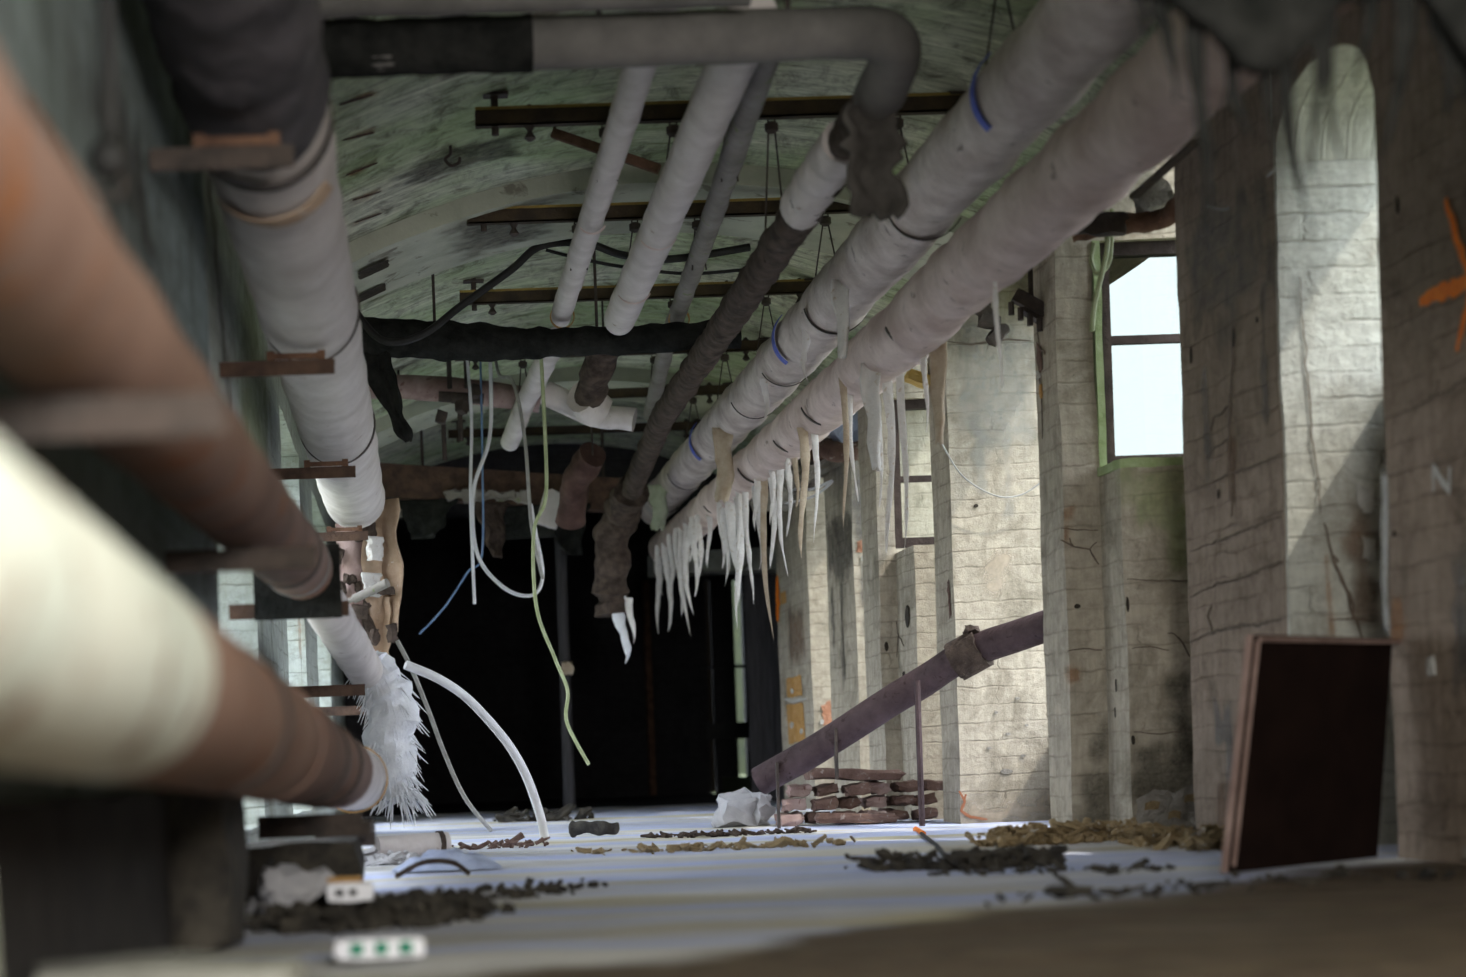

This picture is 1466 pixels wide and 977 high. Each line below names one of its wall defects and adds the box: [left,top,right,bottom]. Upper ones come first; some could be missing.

crack [1061,277,1375,657]